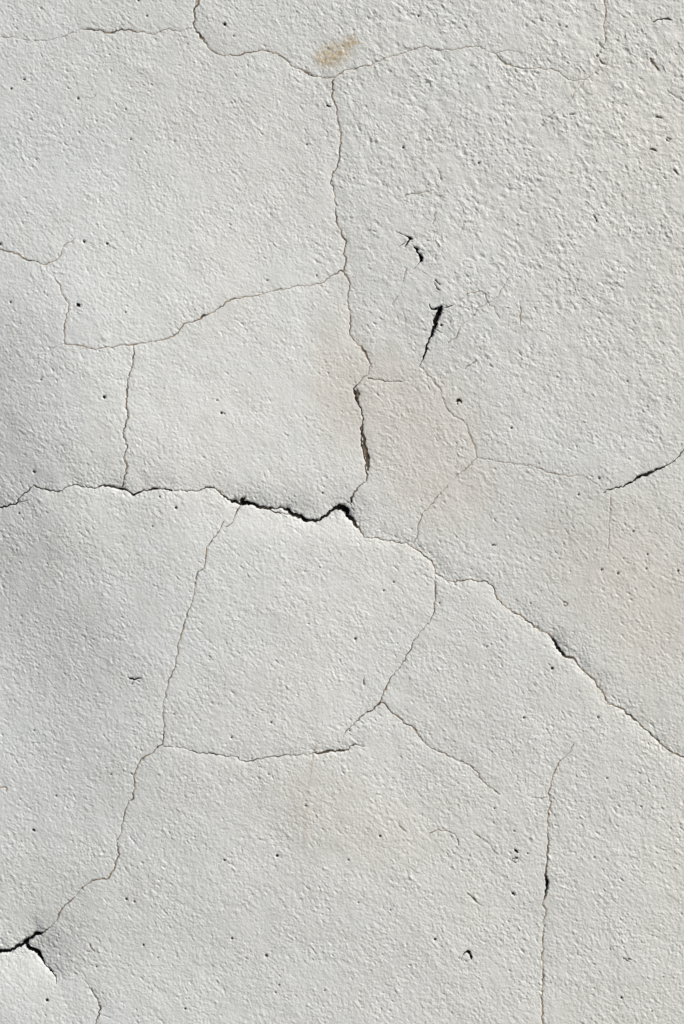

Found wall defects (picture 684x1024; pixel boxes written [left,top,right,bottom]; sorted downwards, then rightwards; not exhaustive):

crack [0,0,684,795]
crack [0,709,172,984]
crack [532,744,574,1024]